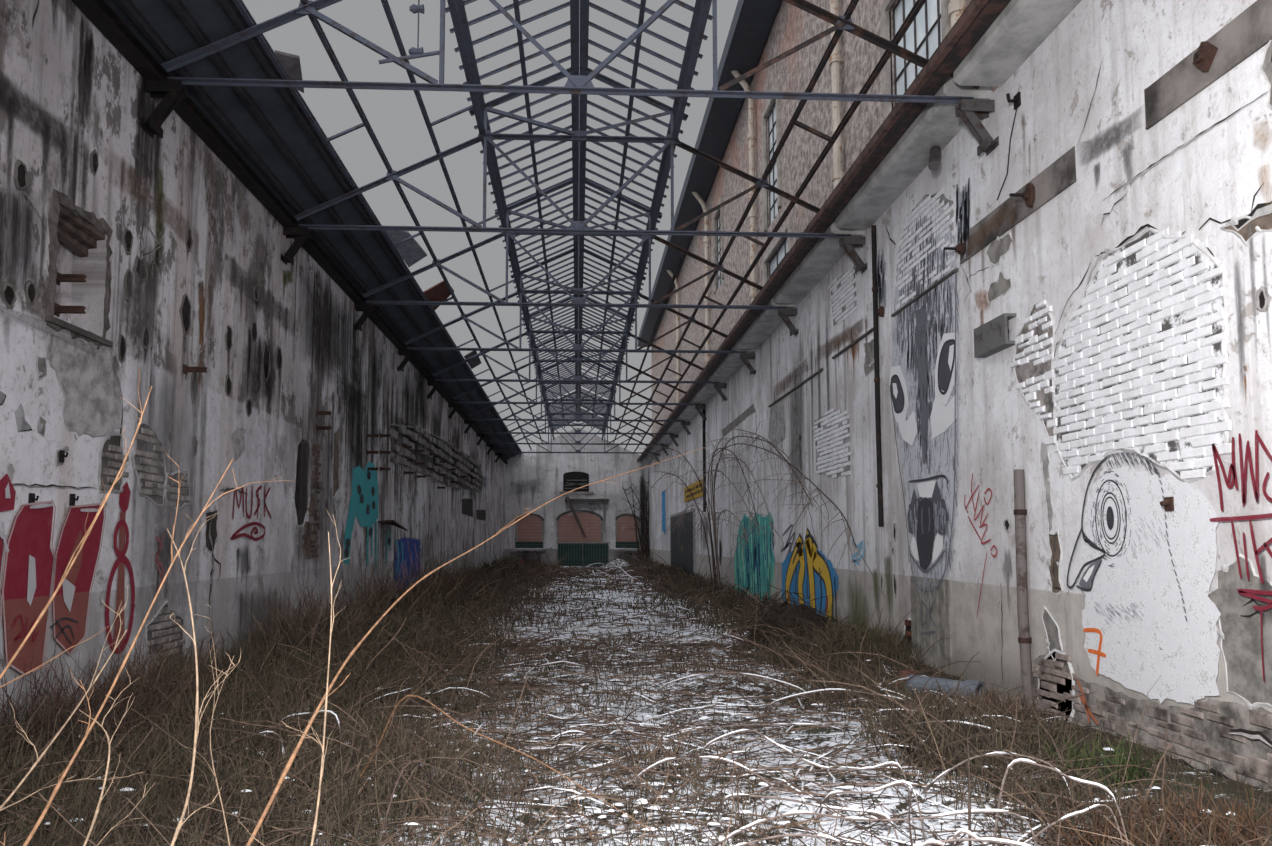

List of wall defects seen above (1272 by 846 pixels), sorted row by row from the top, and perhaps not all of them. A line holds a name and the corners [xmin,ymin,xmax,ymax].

damp [0,78,88,208]
damp [53,0,93,116]
crack [1076,54,1105,147]
damp [0,192,46,278]
flaking render [895,187,955,309]
crack [1052,89,1272,362]
peeling [1222,213,1272,246]
peeling [0,188,193,510]
damp [231,257,489,541]
flaking render [721,395,851,479]
flaking render [1010,227,1232,595]
flaking render [1032,553,1272,791]